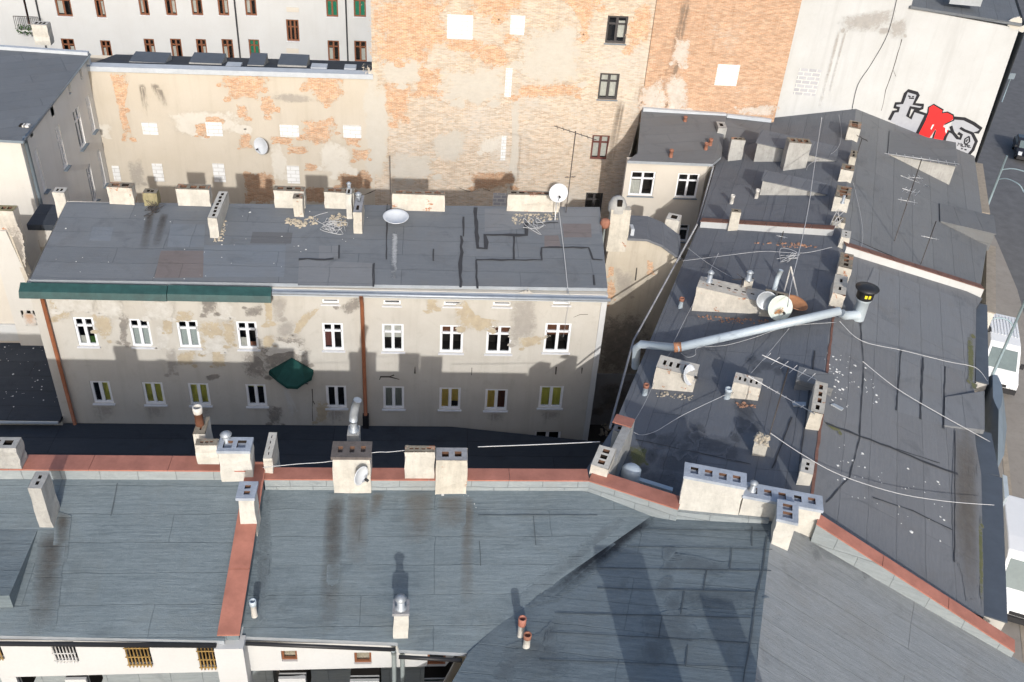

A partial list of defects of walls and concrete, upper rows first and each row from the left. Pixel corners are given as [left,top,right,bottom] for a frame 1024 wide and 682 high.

peeling [564,0,607,44]
peeling [621,2,652,55]
peeling [99,73,137,142]
water stain [138,83,168,117]
peeling [166,75,281,150]
peeling [361,0,531,129]
peeling [508,84,584,102]
water stain [53,512,71,562]
water stain [326,492,385,586]
water stain [402,492,474,605]